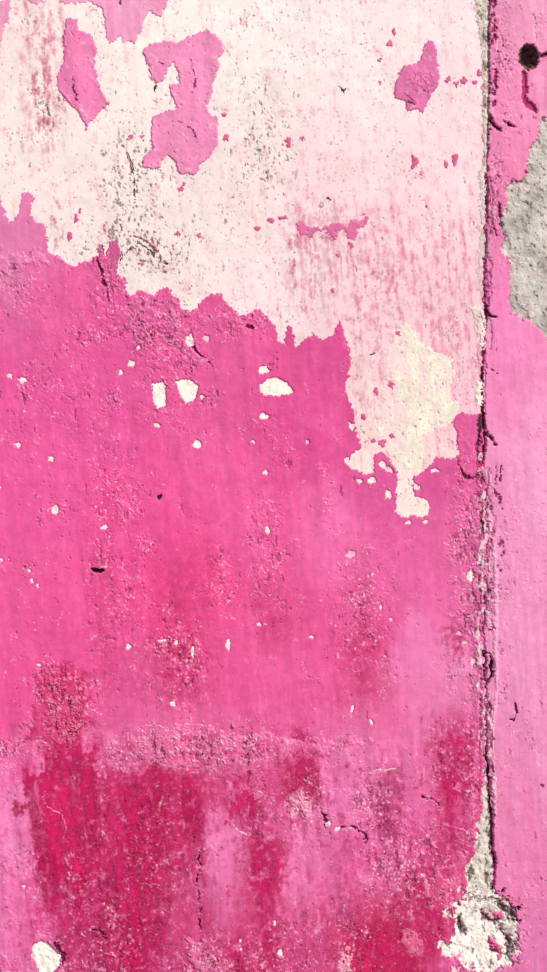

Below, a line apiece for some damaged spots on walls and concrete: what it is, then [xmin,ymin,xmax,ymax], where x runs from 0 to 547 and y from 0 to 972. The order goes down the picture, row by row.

peeling [0,0,486,524]
spalling [500,118,547,337]
crack [453,0,514,900]
peeling [31,941,61,972]
spalling [436,885,526,972]